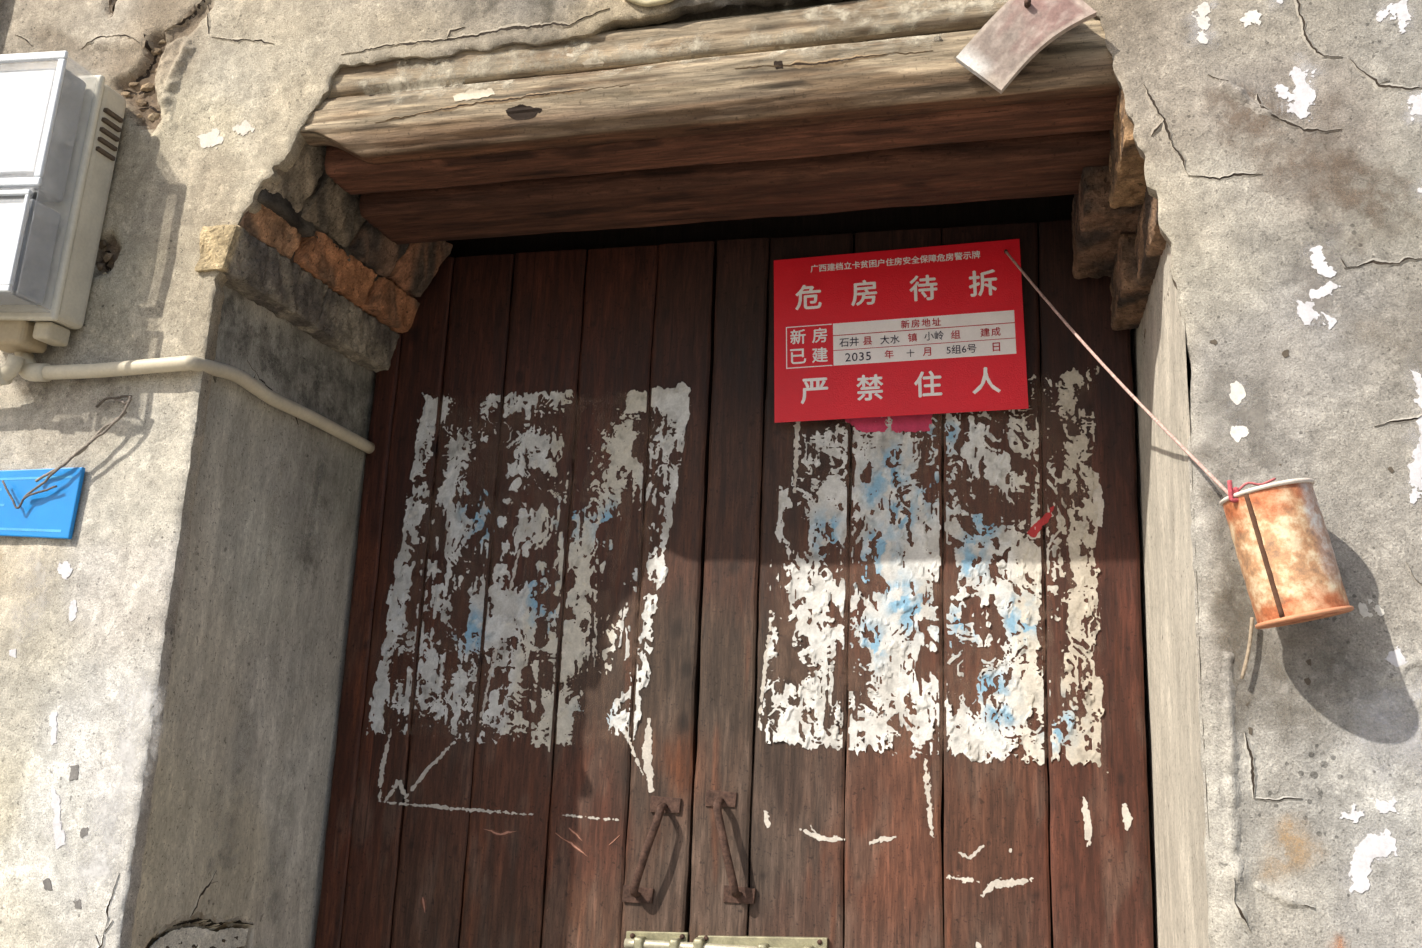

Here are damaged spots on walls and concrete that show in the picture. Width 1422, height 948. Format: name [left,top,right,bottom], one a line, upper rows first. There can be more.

crack [15,34,33,46]
crack [81,0,274,49]
crack [1143,84,1263,182]
crack [1207,74,1342,136]
peeling [1274,66,1316,122]
peeling [1401,91,1422,121]
peeling [1296,245,1341,330]
crack [1341,256,1422,269]
crack [1375,414,1422,427]
peeling [1388,370,1422,506]
crack [1244,732,1302,802]
peeling [1340,796,1399,894]